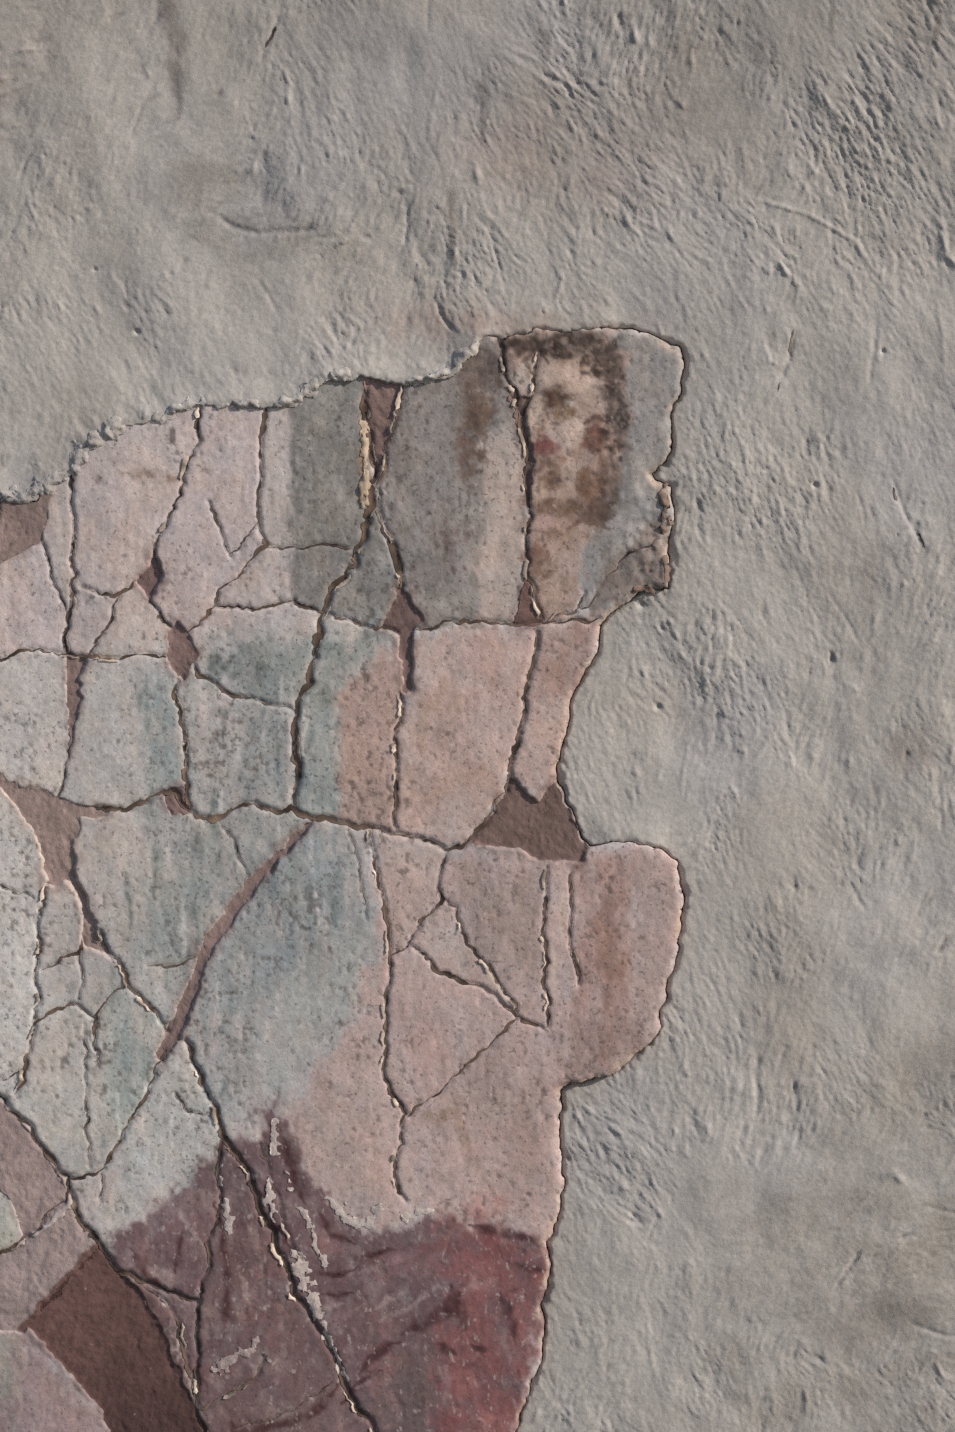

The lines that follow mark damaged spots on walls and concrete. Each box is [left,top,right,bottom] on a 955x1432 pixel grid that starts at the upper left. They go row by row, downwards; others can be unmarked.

spalling [358,420,372,508]
spalling [651,483,675,534]
crack [0,342,658,1201]
crack [0,884,375,1432]
peeling [269,1118,281,1156]
peeling [218,1164,235,1235]
peeling [324,1196,384,1230]
peeling [262,1171,349,1382]
peeling [210,1336,272,1380]